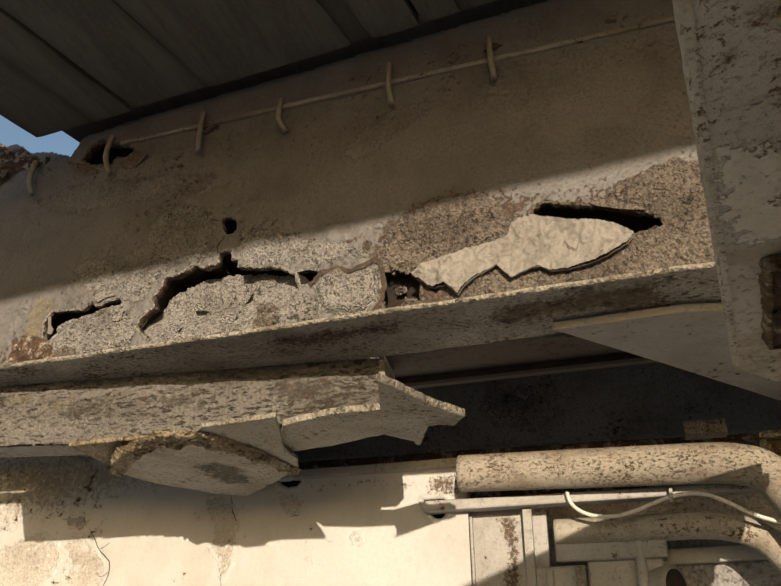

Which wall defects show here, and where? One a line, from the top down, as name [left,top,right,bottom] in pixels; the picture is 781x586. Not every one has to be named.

spalling [0,143,51,184]
spalling [83,142,134,165]
peeling [710,140,781,247]
rust [465,157,715,328]
peeling [7,199,663,363]
peeling [0,455,101,511]
peeling [0,511,106,586]
peeling [204,494,240,585]
rust [499,515,520,586]